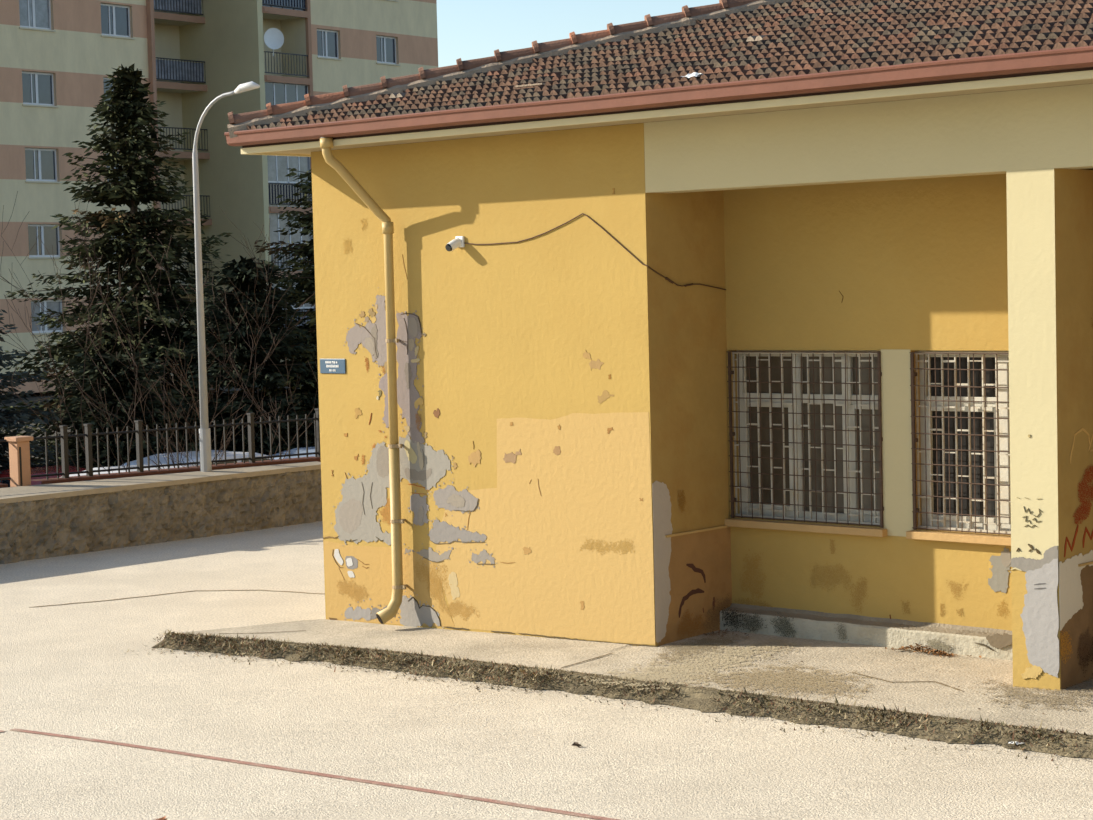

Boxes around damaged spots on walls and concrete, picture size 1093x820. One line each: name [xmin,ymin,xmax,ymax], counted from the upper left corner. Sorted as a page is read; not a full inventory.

peeling [331,293,497,600]
peeling [988,544,1040,593]
peeling [329,599,387,621]
peeling [391,591,444,629]